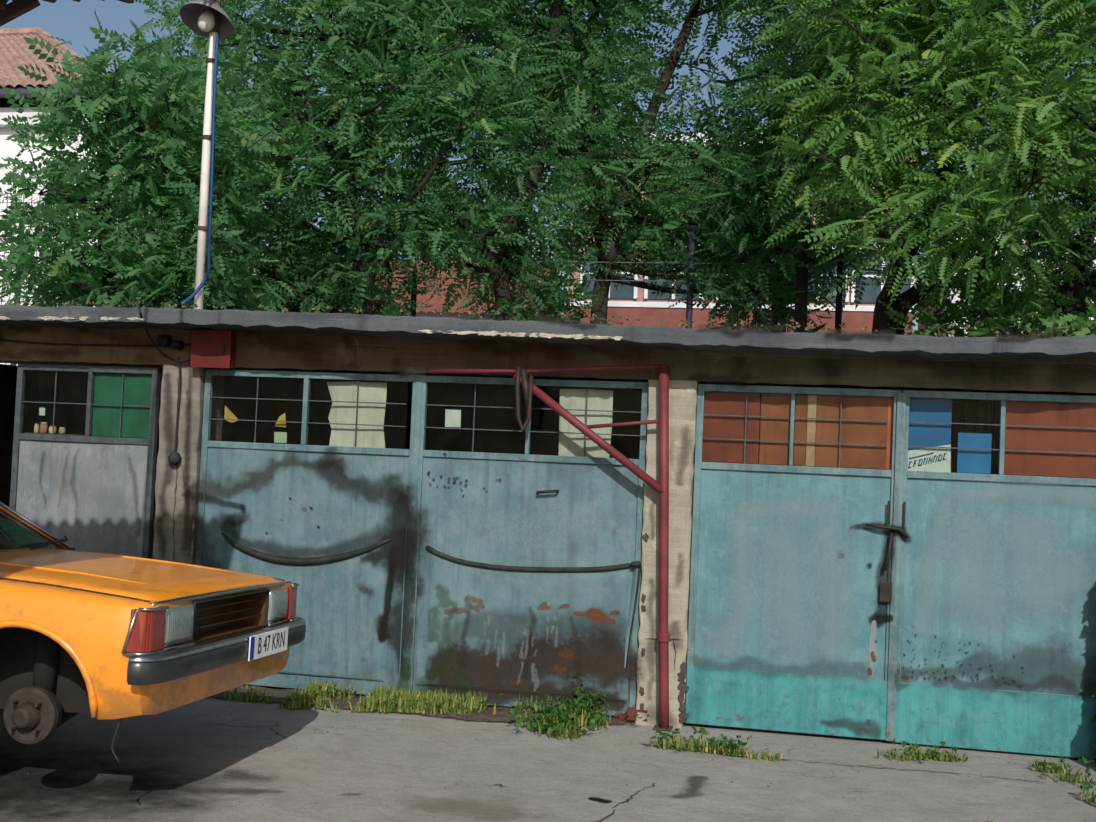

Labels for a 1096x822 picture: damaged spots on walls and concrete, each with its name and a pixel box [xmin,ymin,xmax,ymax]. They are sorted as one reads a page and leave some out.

spalling [418,330,623,341]
rust [538,602,619,623]
crack [596,783,655,822]